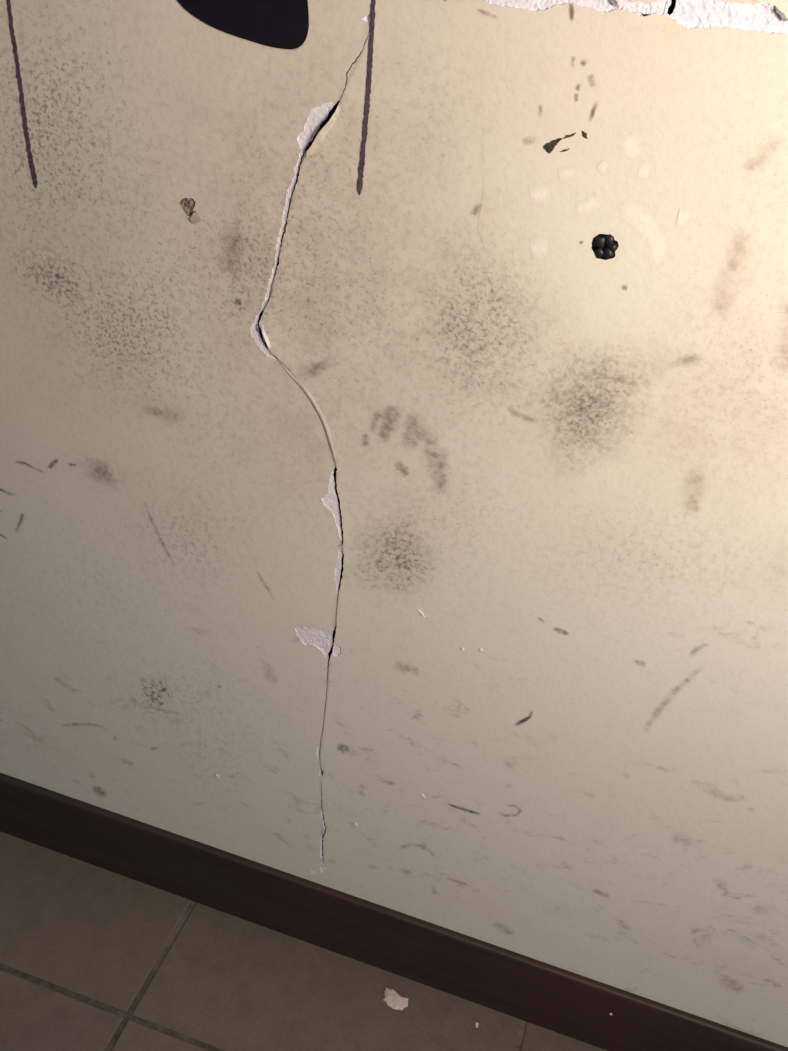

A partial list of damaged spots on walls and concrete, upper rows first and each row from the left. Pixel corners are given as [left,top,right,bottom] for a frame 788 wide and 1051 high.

peeling [483,0,788,34]
crack [663,0,676,17]
spalling [297,102,335,151]
crack [251,30,370,874]
spalling [322,468,342,542]
spalling [295,626,341,657]